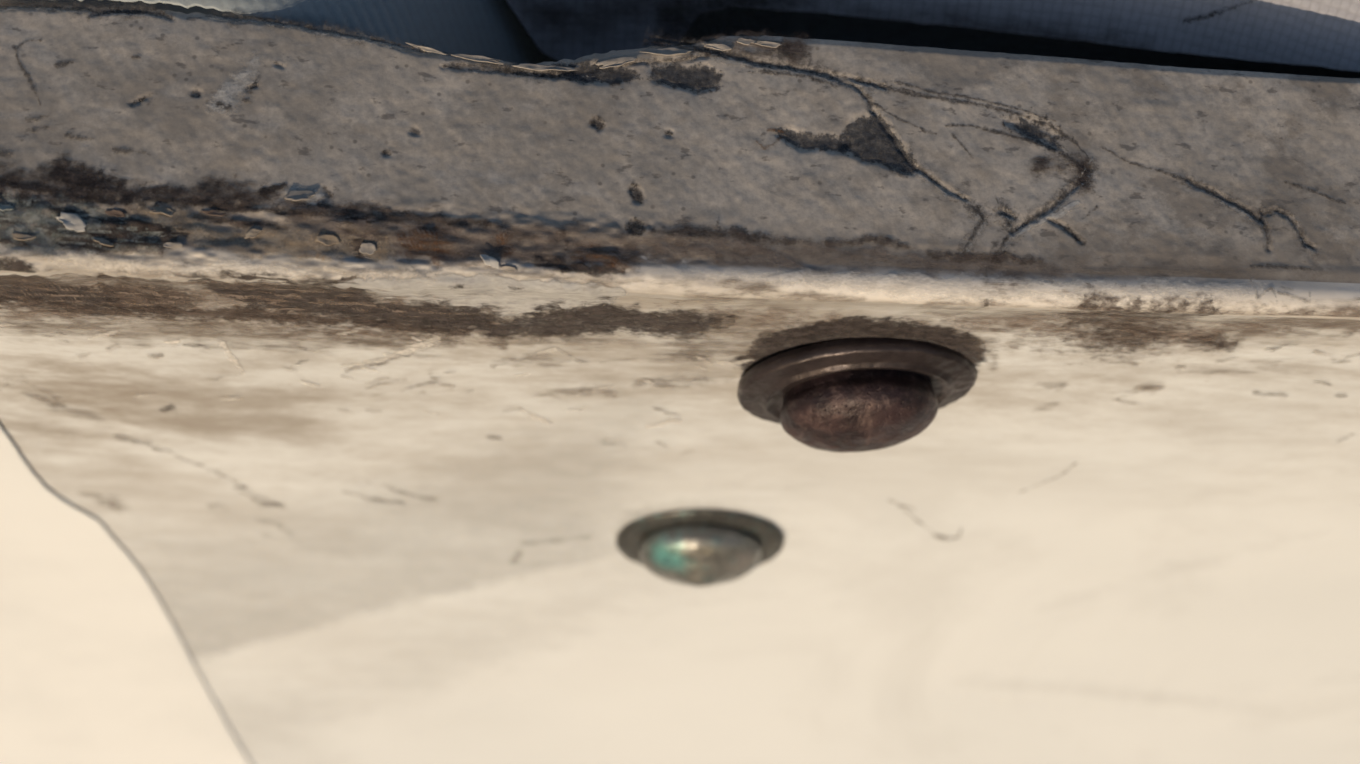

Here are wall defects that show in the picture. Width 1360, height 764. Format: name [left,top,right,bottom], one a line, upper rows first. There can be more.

spalling [405,33,809,93]
damp [0,150,327,216]
spalling [767,116,917,176]
crack [651,36,1345,270]
damp [0,257,837,362]